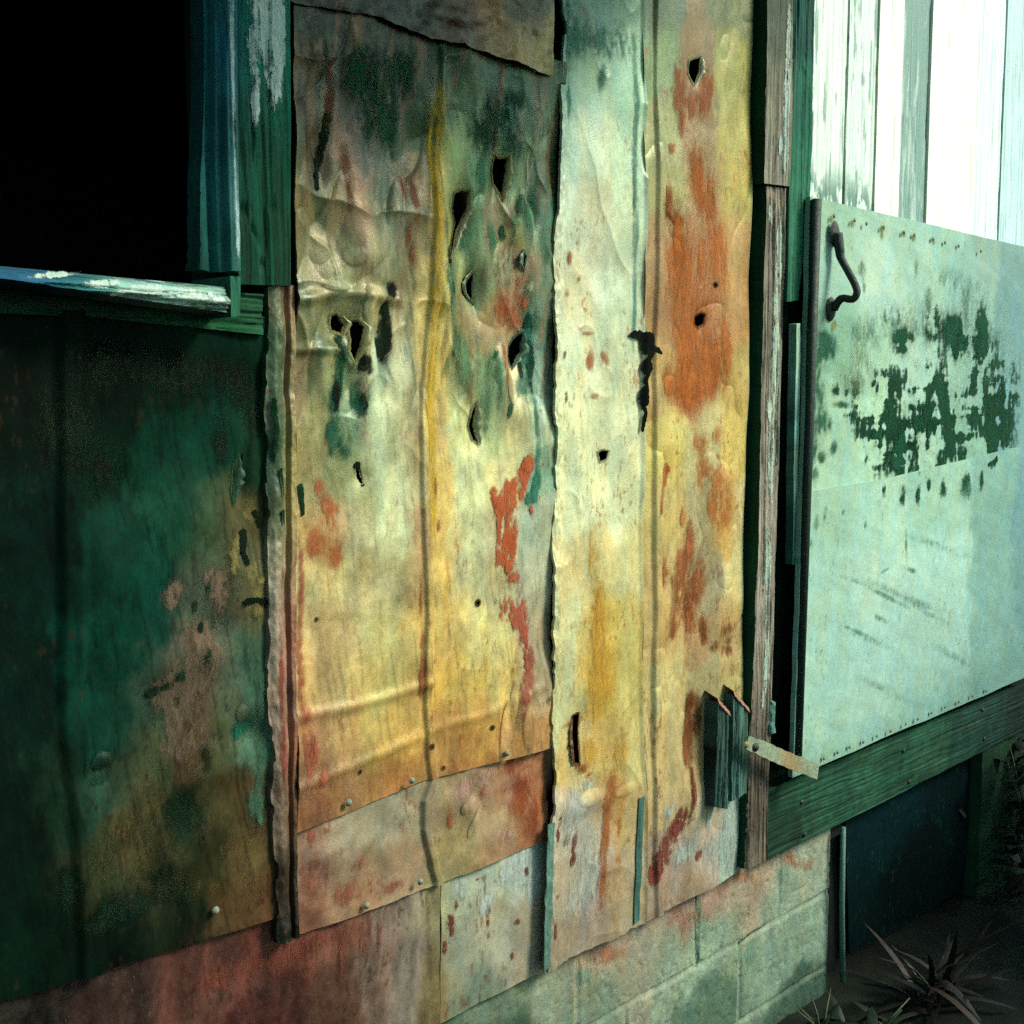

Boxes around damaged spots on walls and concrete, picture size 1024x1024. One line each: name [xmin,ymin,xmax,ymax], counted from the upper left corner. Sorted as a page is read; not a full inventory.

peeling [247,0,286,123]
corrosion [670,66,714,153]
peeling [499,225,534,293]
corrosion [664,148,732,412]
spalling [518,312,535,391]
crack [630,329,663,432]
peeling [812,299,1021,506]
corrosion [695,428,732,529]
corrosion [490,454,535,720]
corrosion [663,508,732,655]
corrosion [647,689,702,886]